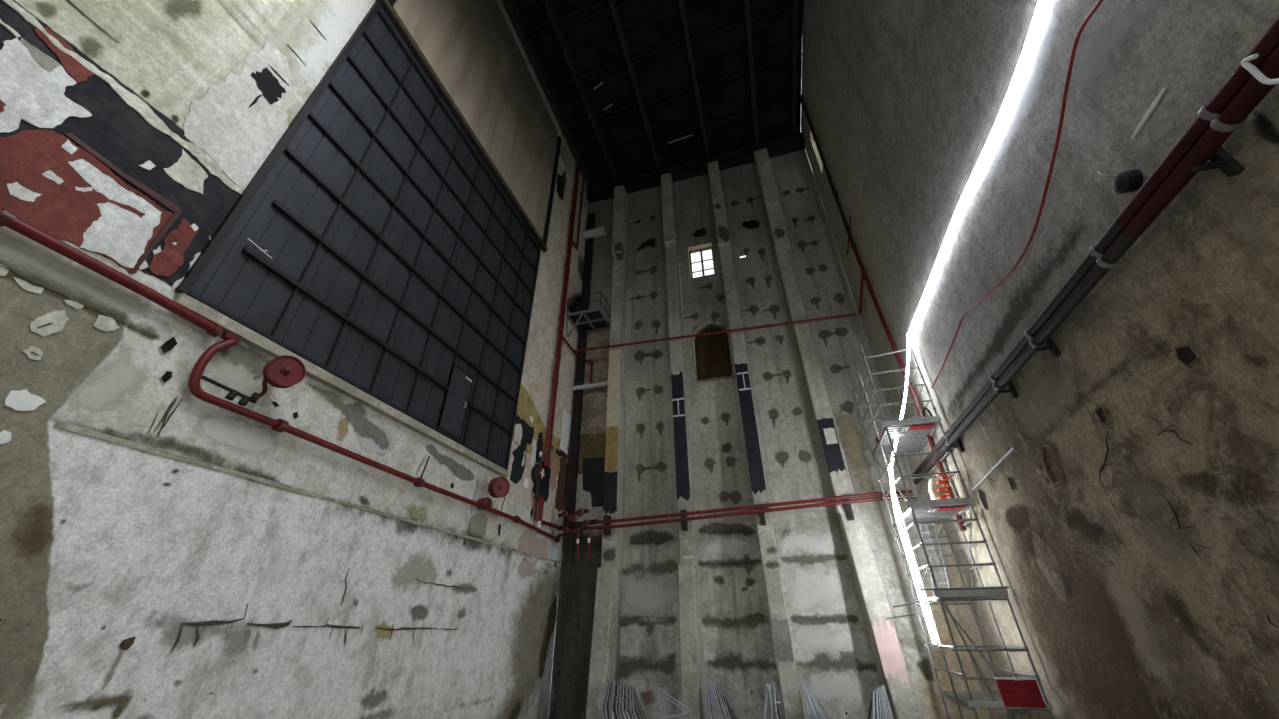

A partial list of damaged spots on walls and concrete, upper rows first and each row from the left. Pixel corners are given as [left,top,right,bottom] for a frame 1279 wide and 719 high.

peeling [0,19,211,293]
crack [170,568,458,653]
crack [412,578,472,595]
water stain [603,549,615,561]
water stain [619,522,876,715]